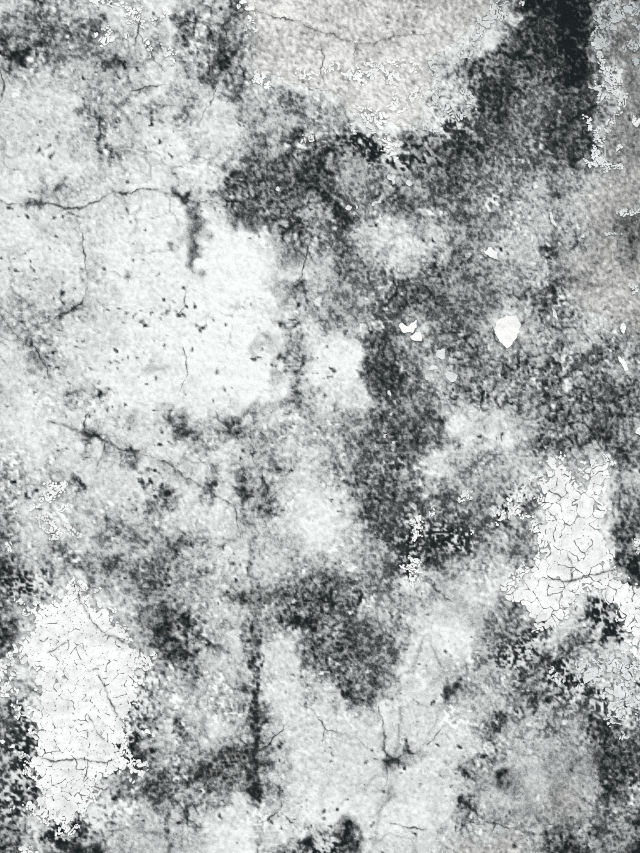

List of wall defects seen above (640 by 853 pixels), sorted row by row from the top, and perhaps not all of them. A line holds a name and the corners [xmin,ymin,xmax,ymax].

water stain [0,0,101,70]
water stain [100,55,126,71]
crack [7,200,100,267]
peeling [569,0,640,338]
water stain [112,0,640,815]
water stain [0,557,35,659]
water stain [93,537,215,670]
peeling [491,451,640,740]
peeling [0,576,157,836]
water stain [0,700,48,853]
water stain [40,819,107,853]